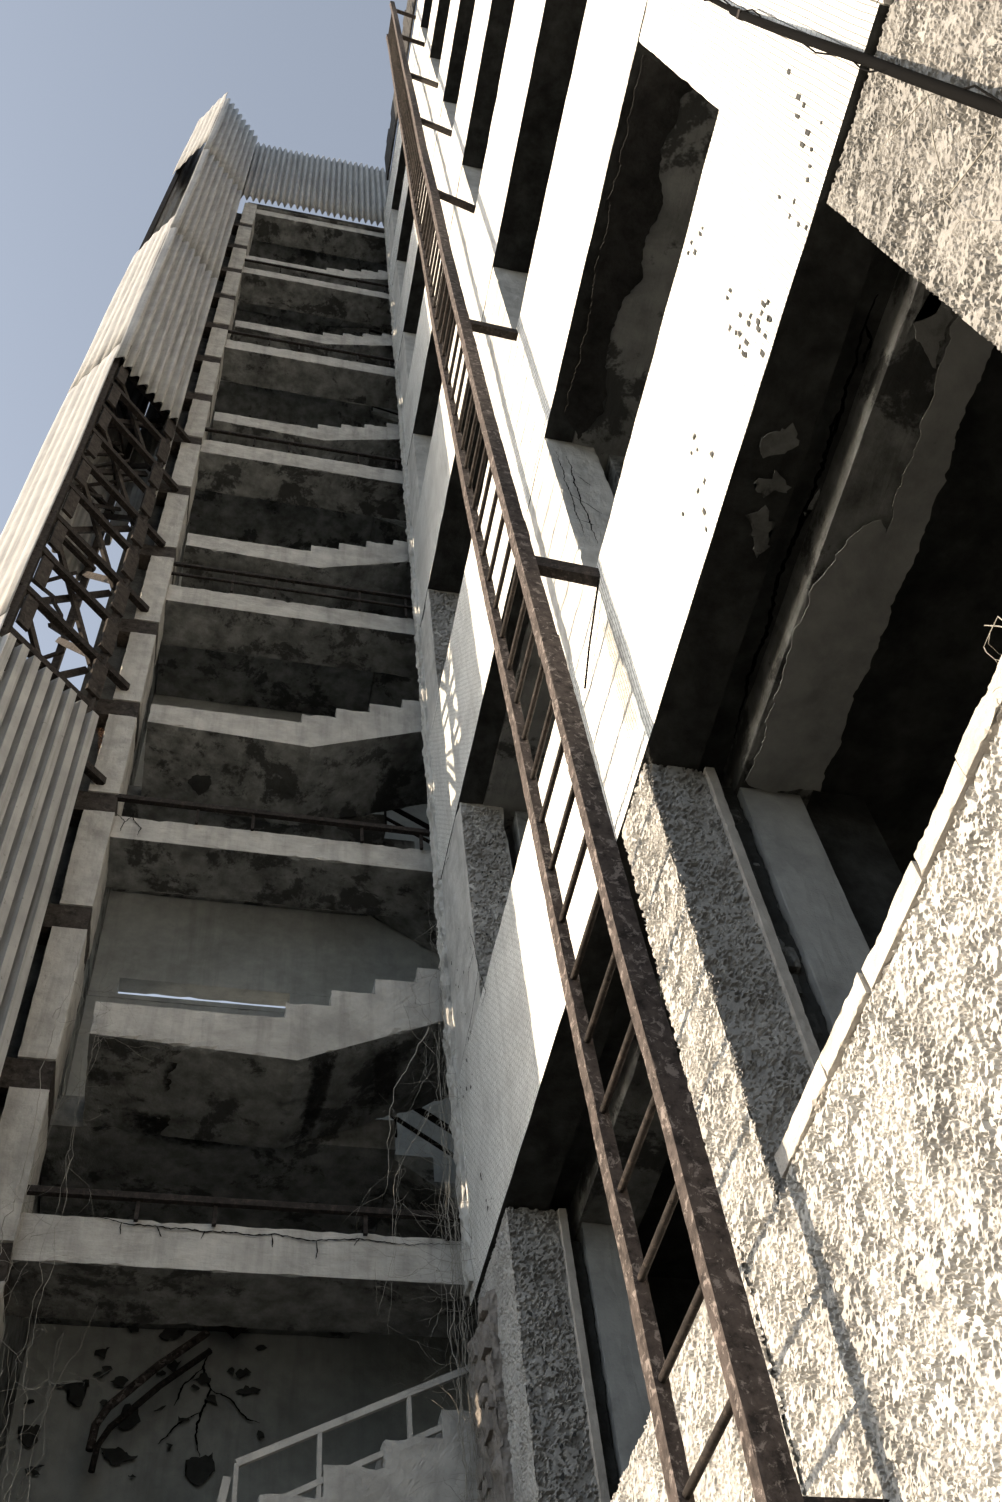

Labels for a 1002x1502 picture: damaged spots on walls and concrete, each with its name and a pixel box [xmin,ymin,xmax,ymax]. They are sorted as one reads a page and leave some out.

peeling [794,93,823,183]
flaking render [722,288,995,1053]
damp [123,1108,230,1148]
damp [300,1055,334,1138]
damp [369,1042,400,1112]
crack [158,1357,259,1457]